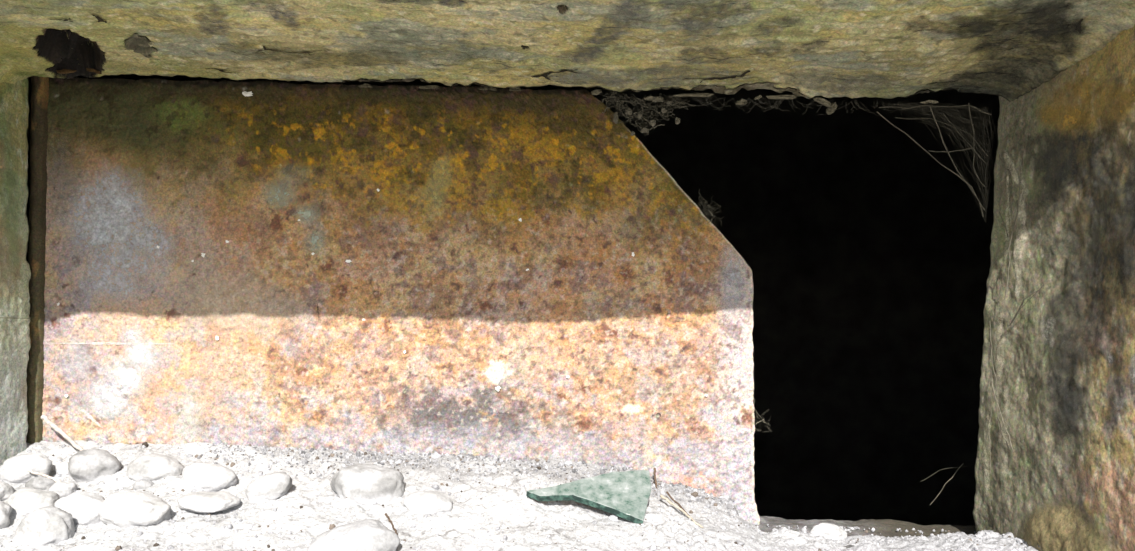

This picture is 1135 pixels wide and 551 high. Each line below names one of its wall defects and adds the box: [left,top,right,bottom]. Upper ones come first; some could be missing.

spalling [33,28,106,80]
damp [909,0,1082,99]
damp [1036,129,1135,433]